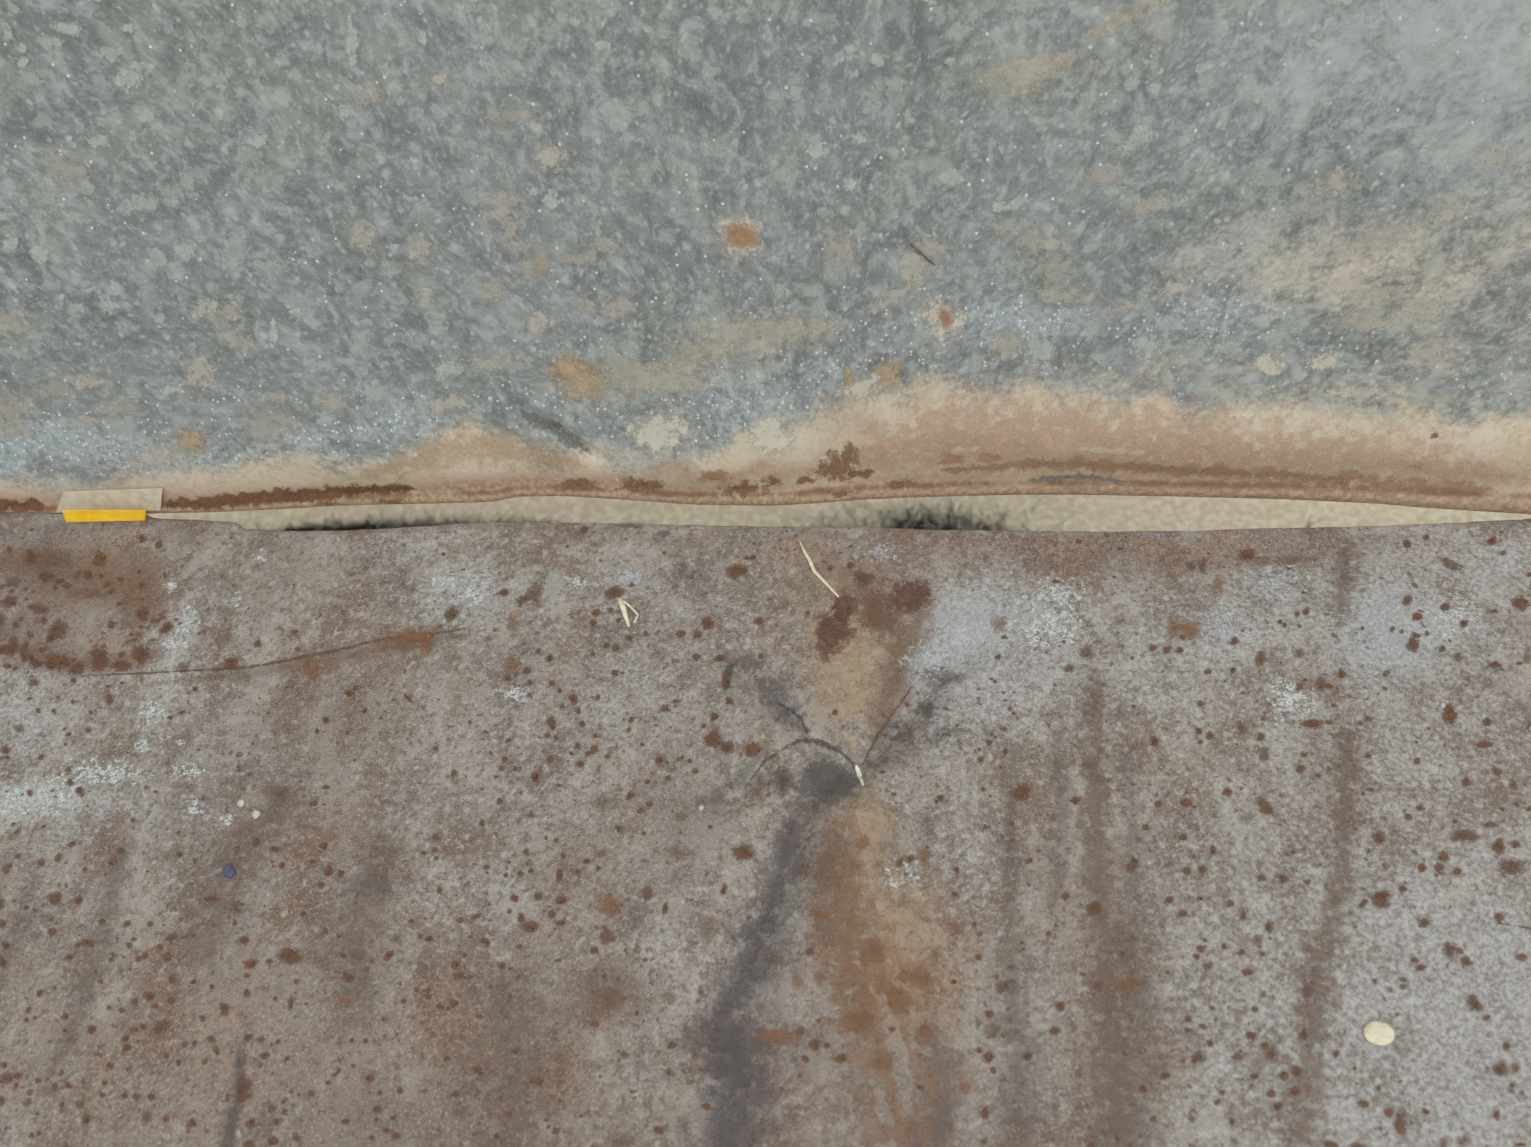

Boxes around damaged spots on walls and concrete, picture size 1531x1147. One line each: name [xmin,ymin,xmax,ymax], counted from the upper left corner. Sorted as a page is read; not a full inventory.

damp [549,312,844,465]
damp [835,359,902,405]
rust [560,476,662,492]
rust [1029,474,1126,486]
damp [898,576,1097,718]
damp [725,656,806,730]
rust [0,483,1531,1147]
damp [884,854,922,891]
damp [682,723,913,1147]